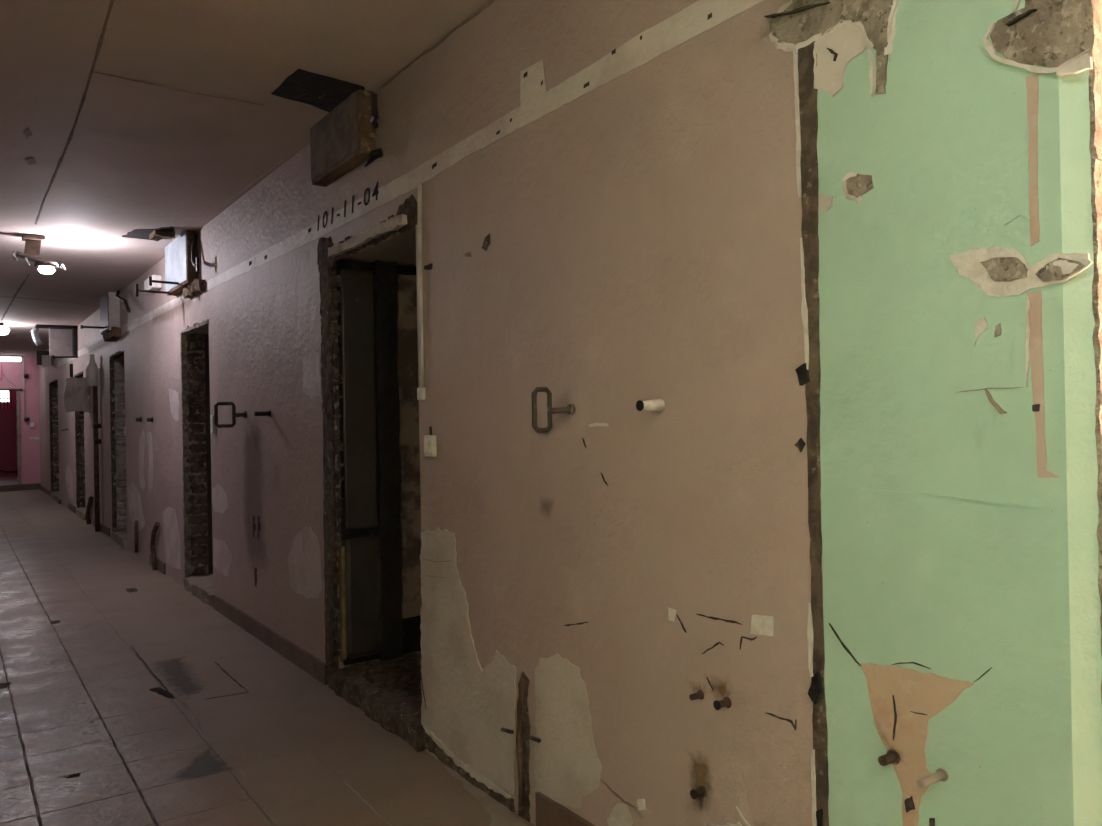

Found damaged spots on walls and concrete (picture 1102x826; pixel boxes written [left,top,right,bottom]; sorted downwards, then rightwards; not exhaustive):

spalling [764,0,899,198]
spalling [819,172,874,212]
peeling [795,238,810,386]
spalling [949,0,1102,656]
peeling [418,527,517,812]
peeling [534,653,646,826]
peeling [807,603,823,705]
peeling [811,749,823,826]
peeling [860,663,974,826]